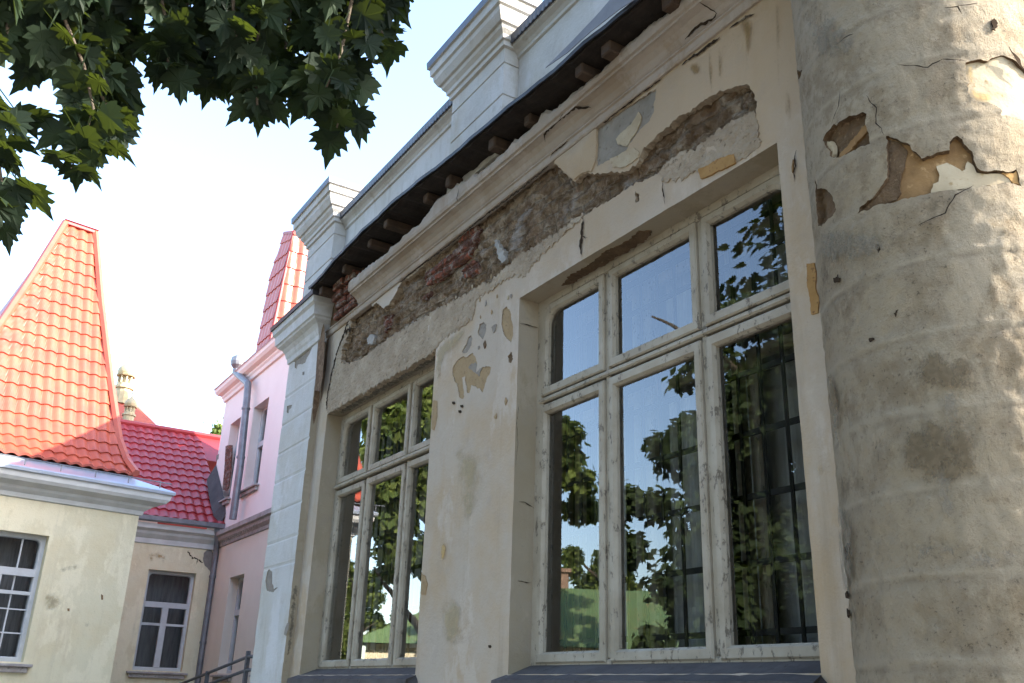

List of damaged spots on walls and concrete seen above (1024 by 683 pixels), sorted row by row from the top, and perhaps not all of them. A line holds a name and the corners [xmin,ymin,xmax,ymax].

peeling [903,57,1024,120]
crack [400,80,660,282]
flaking render [327,88,762,414]
peeling [806,263,820,315]
flaking render [821,189,836,225]
flaking render [827,95,1020,225]
water stain [905,353,976,515]